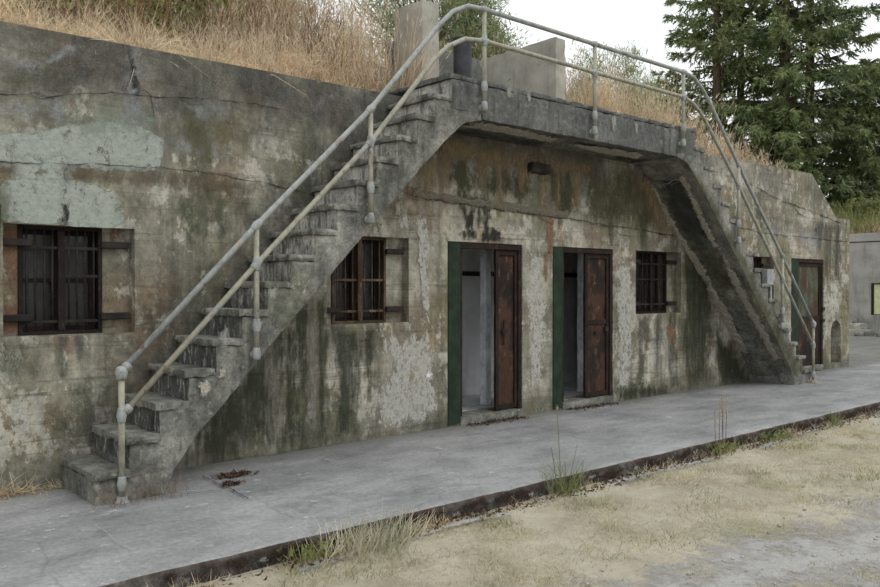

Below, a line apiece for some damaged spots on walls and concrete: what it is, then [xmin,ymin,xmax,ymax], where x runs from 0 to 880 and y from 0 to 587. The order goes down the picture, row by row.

crack [0,55,294,123]
peeling [0,121,164,228]
crack [0,161,315,205]
water stain [183,249,251,335]
water stain [265,300,327,445]
water stain [261,137,364,247]
peeling [378,215,439,428]
water stain [459,206,501,242]
water stain [423,131,592,231]
corrosion [544,217,556,279]
peeling [616,264,635,388]